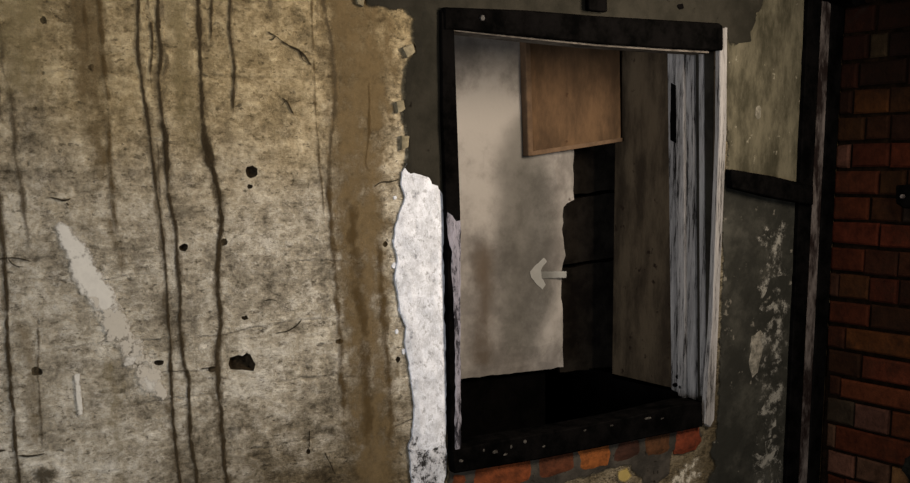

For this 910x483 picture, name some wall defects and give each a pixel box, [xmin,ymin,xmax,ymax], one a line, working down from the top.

water stain [0,196,21,483]
water stain [9,90,17,152]
water stain [16,165,27,229]
water stain [36,469,55,483]
water stain [135,0,199,483]
water stain [196,0,241,483]
spalling [228,353,255,371]
peeling [355,0,763,483]
peeling [708,183,795,483]